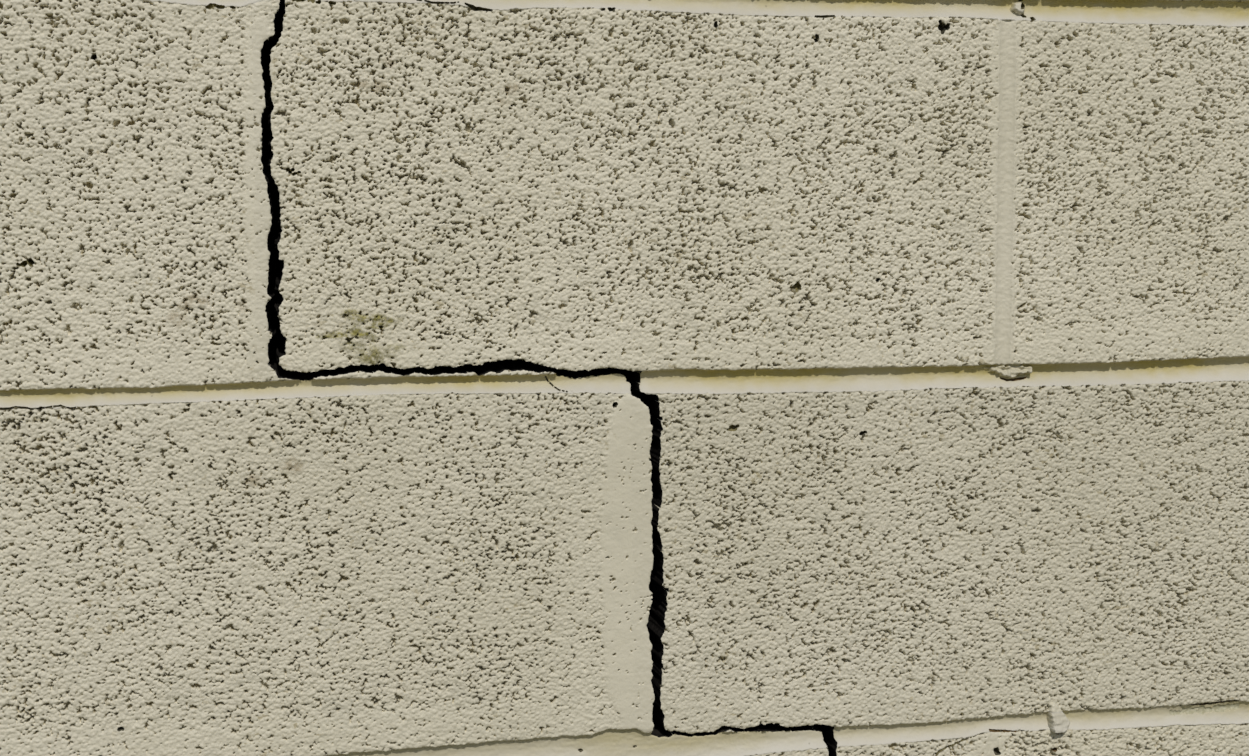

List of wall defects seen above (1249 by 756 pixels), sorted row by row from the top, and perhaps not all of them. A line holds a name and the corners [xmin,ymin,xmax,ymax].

crack [0,404,76,418]
crack [260,0,837,756]